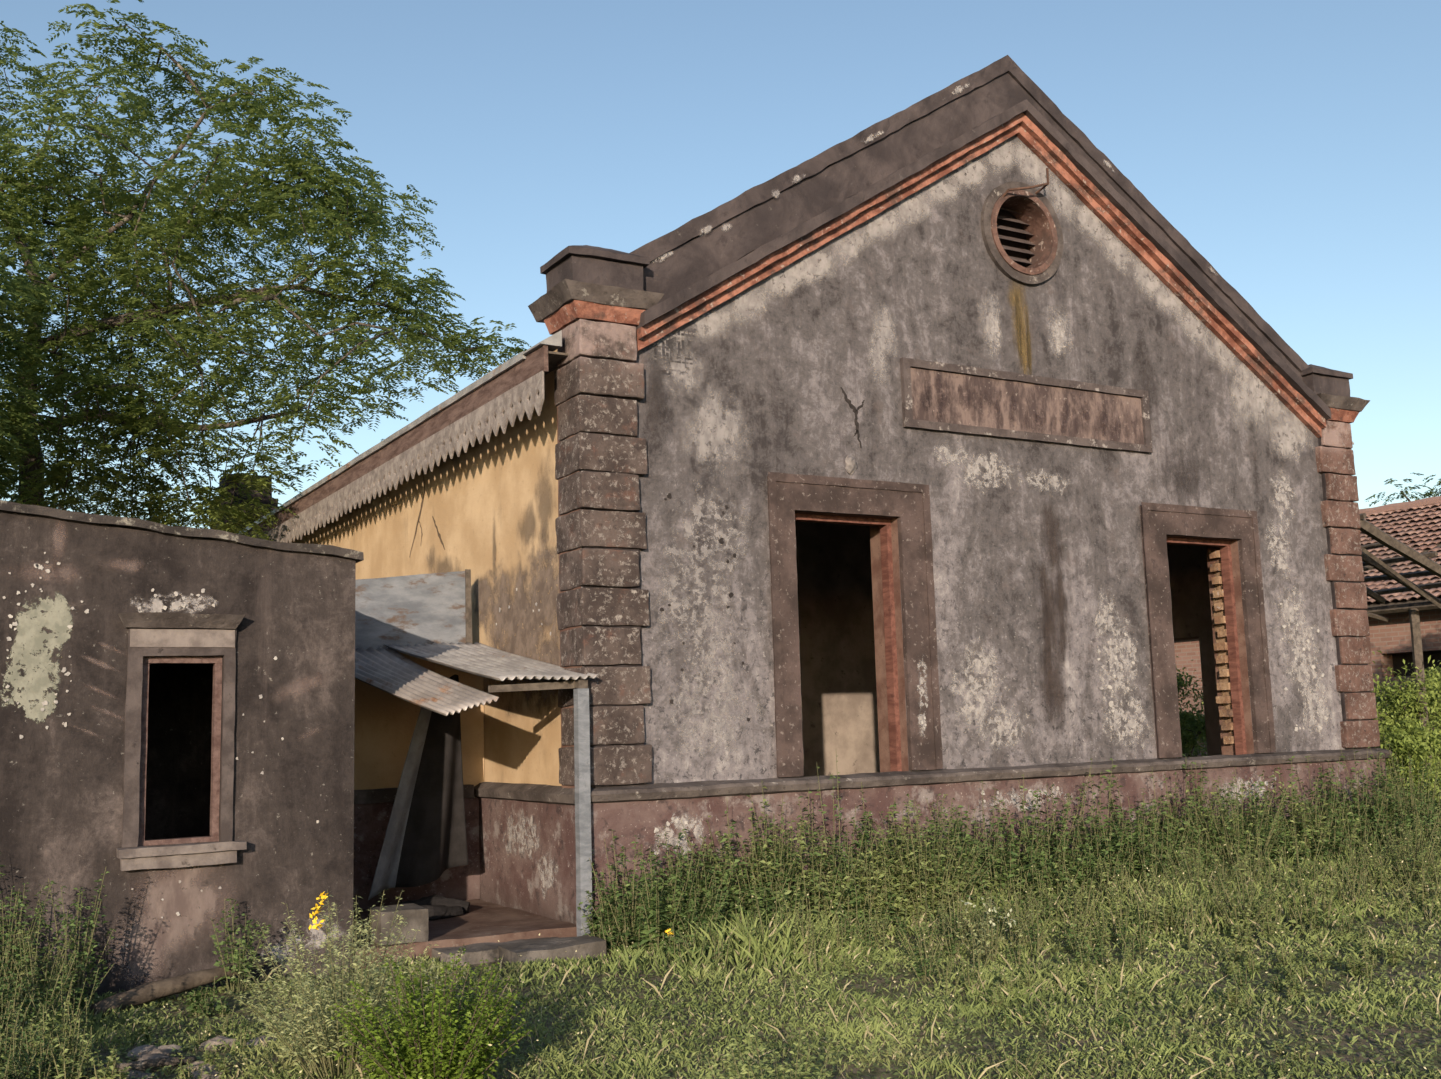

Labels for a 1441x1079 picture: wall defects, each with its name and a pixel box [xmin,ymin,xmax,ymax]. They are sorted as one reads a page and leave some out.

corrosion [1010,288,1031,370]
crack [840,387,865,448]
peeling [2,552,73,659]
peeling [131,588,215,613]
leakage [1044,517,1065,711]
peeling [41,655,72,729]
peeling [654,813,703,855]